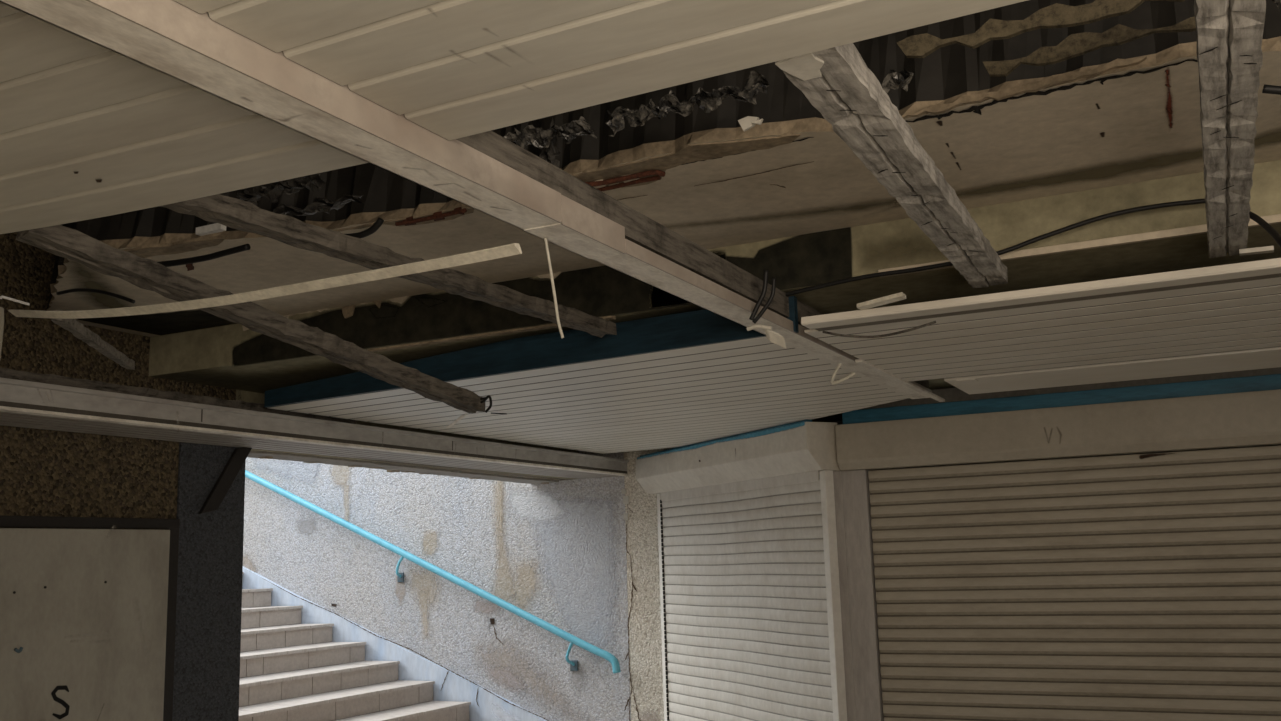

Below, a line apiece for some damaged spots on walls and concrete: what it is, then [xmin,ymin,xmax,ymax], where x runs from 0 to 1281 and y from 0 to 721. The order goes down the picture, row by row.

rust [1165,70,1173,128]
crack [264,579,548,721]
crack [621,488,640,721]